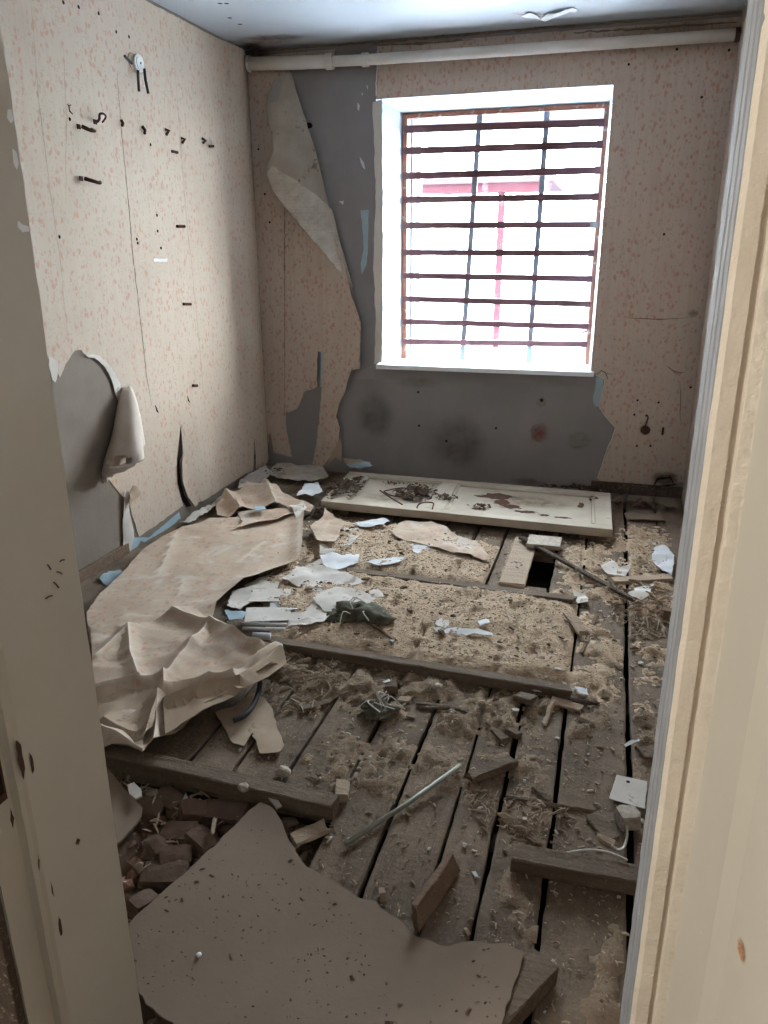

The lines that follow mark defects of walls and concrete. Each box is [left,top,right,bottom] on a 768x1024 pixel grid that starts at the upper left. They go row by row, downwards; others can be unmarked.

flaking render [49,350,139,571]
flaking render [290,50,615,519]